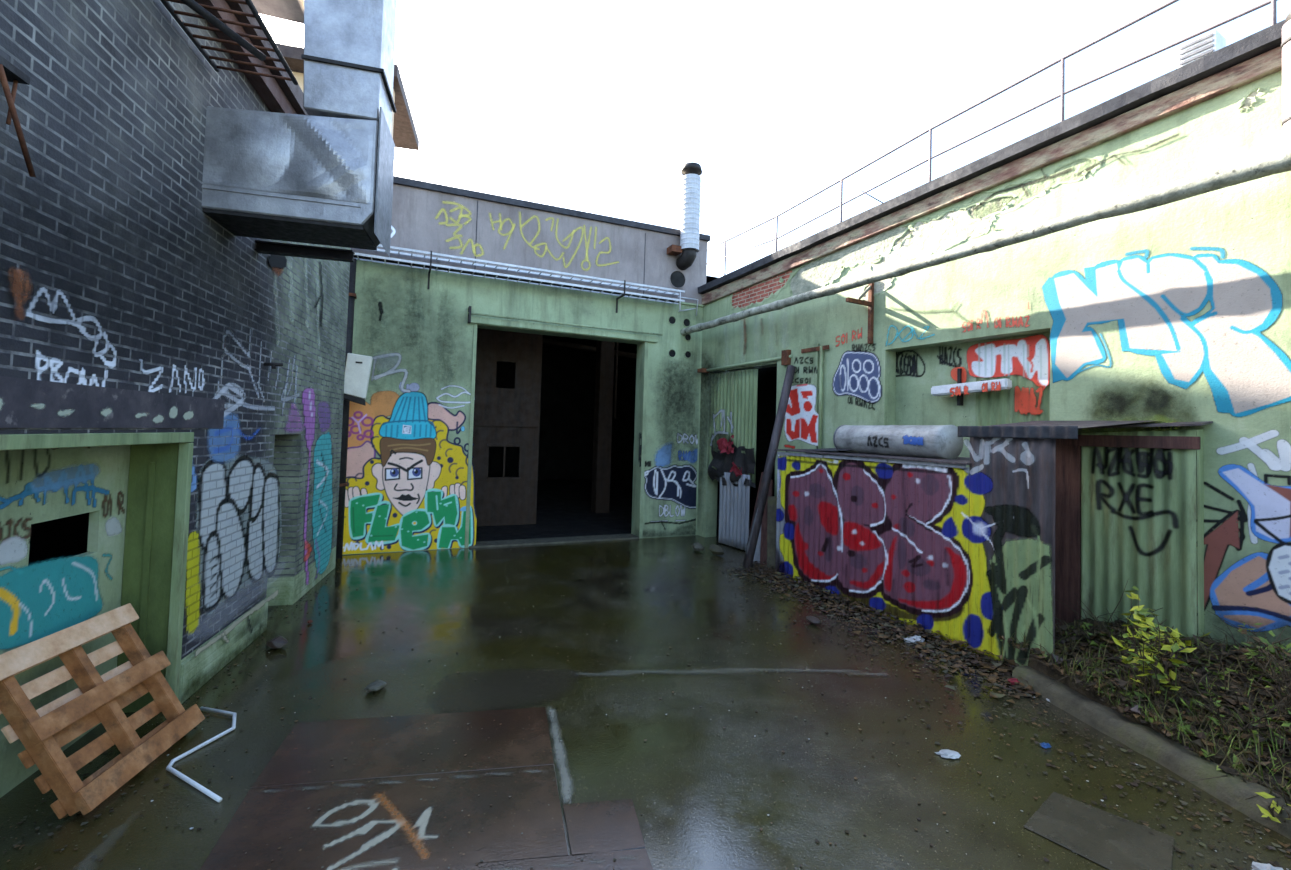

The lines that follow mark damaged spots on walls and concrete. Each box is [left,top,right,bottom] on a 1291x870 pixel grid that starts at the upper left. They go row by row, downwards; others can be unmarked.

peeling [729,154,1108,311]